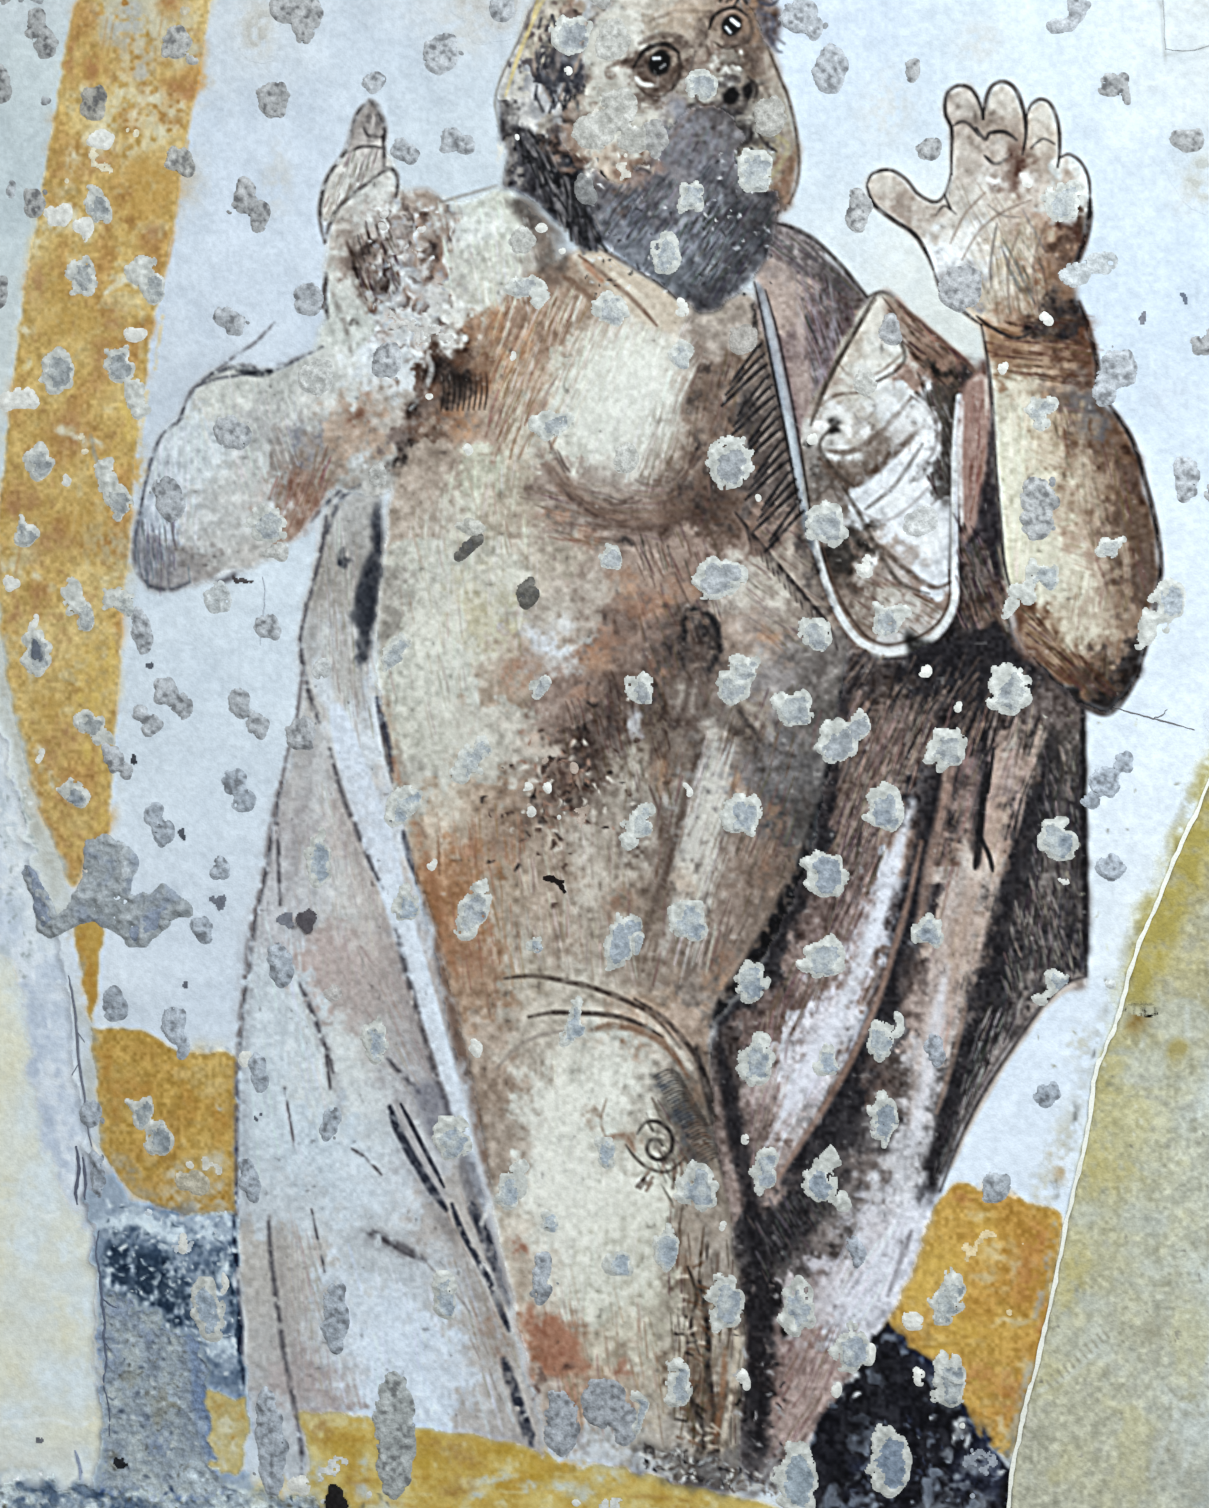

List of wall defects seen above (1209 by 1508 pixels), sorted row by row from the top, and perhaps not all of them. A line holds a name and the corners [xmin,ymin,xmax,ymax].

peeling [378,210,388,231]
peeling [388,309,454,347]
peeling [961,1230,997,1262]